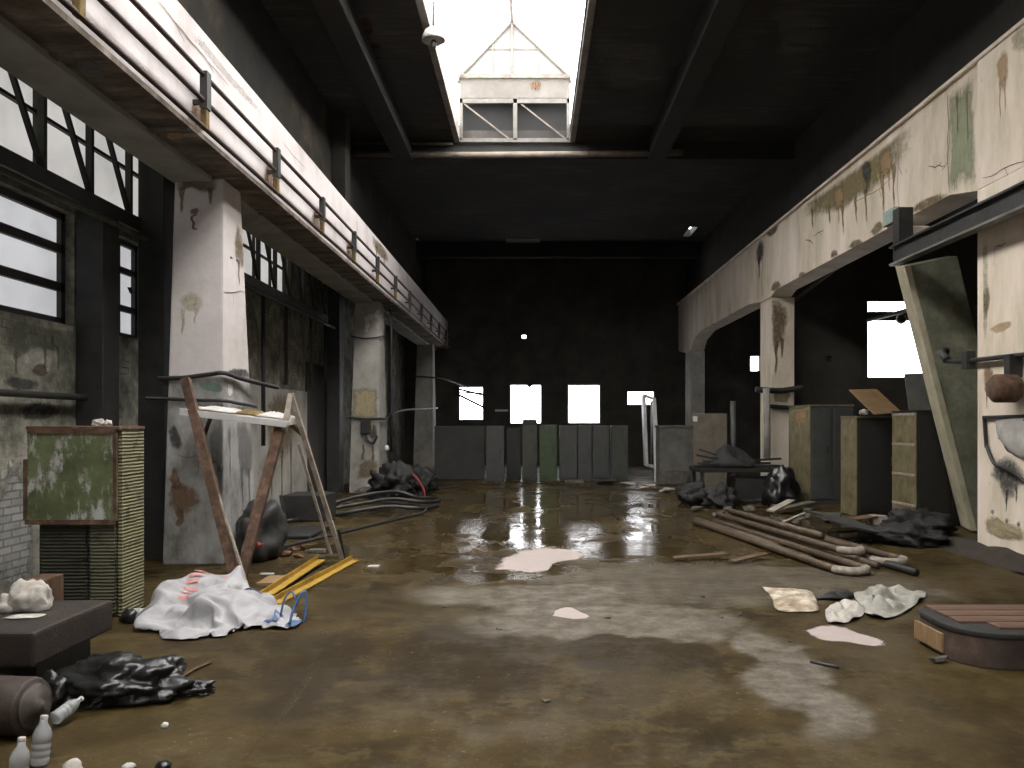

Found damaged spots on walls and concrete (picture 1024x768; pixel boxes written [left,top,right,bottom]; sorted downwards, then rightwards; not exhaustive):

corrosion [997,54,1007,114]
leakage [756,226,777,276]
leakage [6,323,62,389]
leakage [772,304,787,372]
spalling [0,460,32,584]
corrosion [170,469,199,526]
leakage [994,459,1022,510]